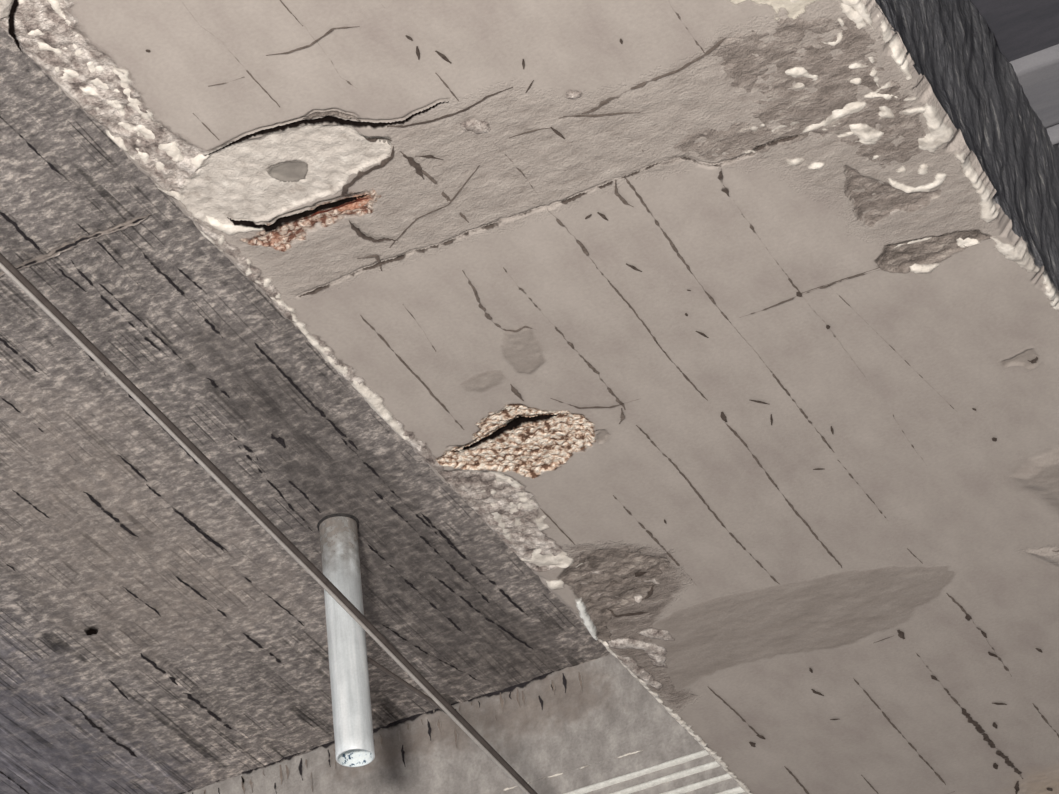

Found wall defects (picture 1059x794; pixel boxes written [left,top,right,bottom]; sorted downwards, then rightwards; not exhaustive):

crack [203,87,513,156]
crack [227,165,498,297]
crack [403,155,443,180]
leakage [203,0,999,301]
crack [510,37,726,138]
crack [561,157,729,207]
peeling [823,0,912,80]
peeling [802,57,954,160]
spalling [843,164,946,228]
spalling [875,153,1059,310]
spalling [0,0,752,794]
leakage [651,564,958,691]